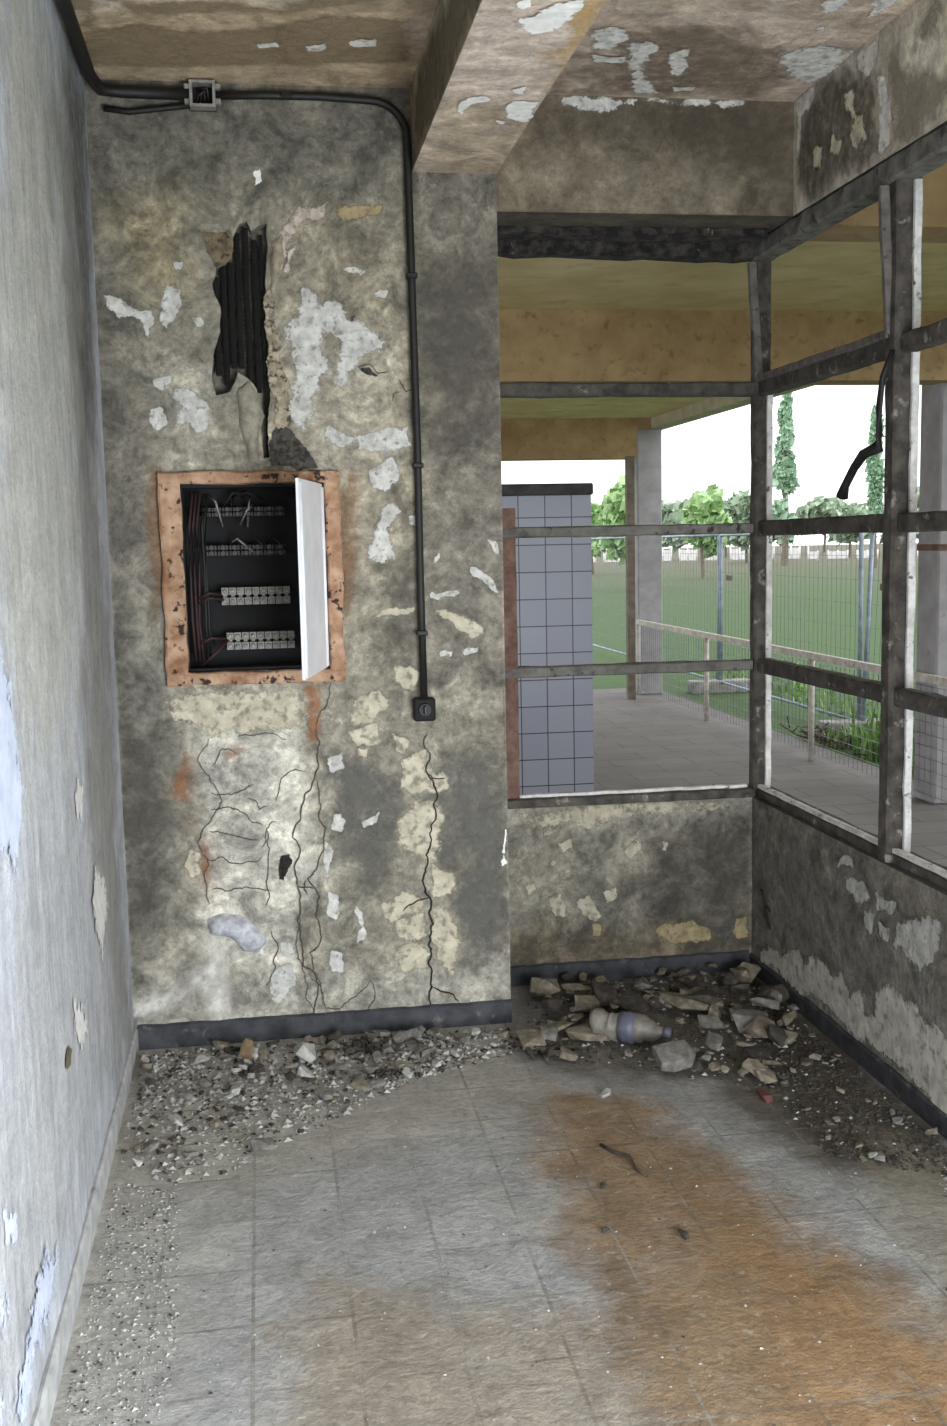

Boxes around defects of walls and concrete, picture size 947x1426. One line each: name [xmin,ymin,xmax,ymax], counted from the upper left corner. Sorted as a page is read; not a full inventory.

leakage [69,0,407,414]
peeling [561,27,745,113]
peeling [779,0,892,170]
leakage [799,71,875,199]
leakage [890,58,947,141]
peeling [104,285,204,338]
peeling [263,287,415,564]
peeling [430,590,484,657]
crack [197,684,376,1014]
crack [403,734,459,1005]
peeling [837,855,942,972]
peeling [760,945,947,1114]